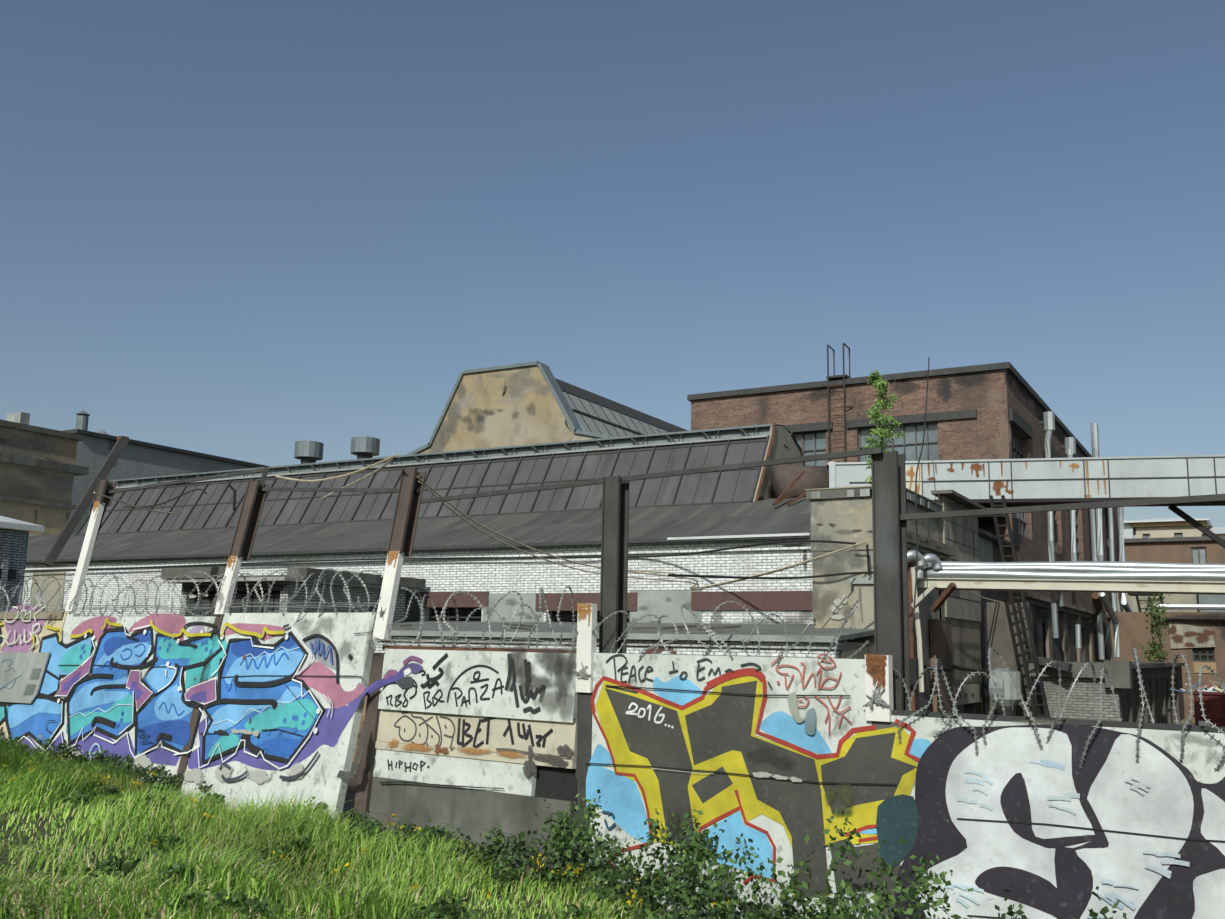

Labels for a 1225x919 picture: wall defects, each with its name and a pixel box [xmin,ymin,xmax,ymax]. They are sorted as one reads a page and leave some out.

rust [907,462,1012,496]
rust [1060,460,1106,497]